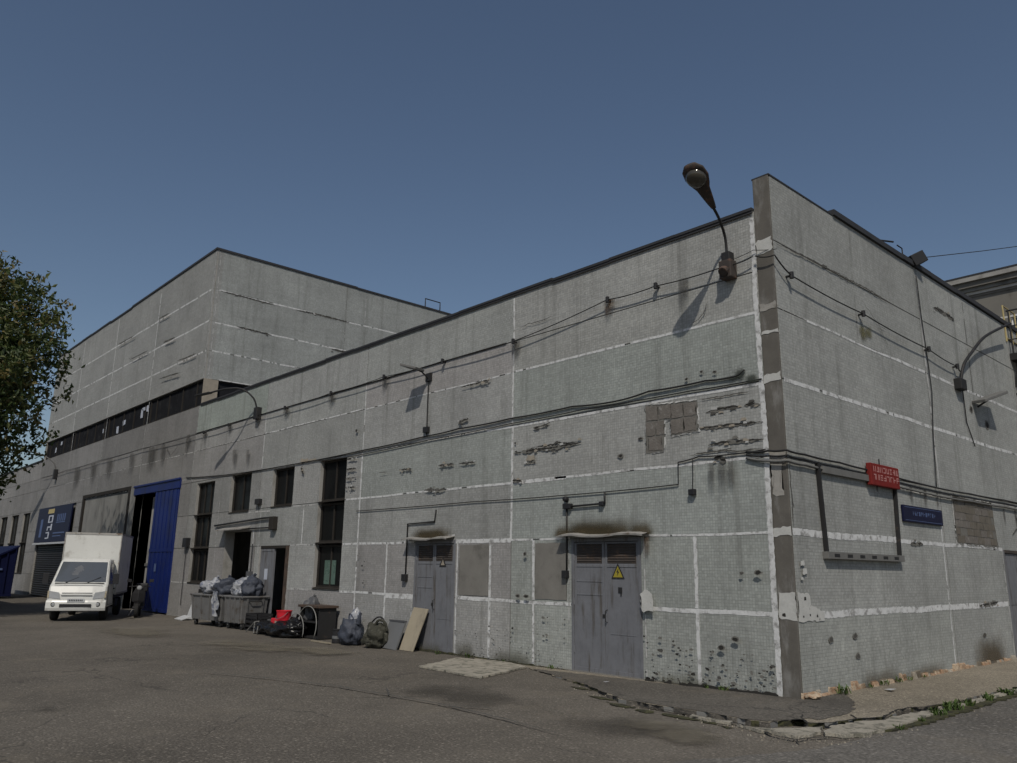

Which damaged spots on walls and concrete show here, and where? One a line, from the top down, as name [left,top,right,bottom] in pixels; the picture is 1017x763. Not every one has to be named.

spalling [514,438,581,464]
peeling [638,399,763,463]
peeling [769,451,786,496]
peeling [778,592,825,623]
peeling [643,635,777,691]